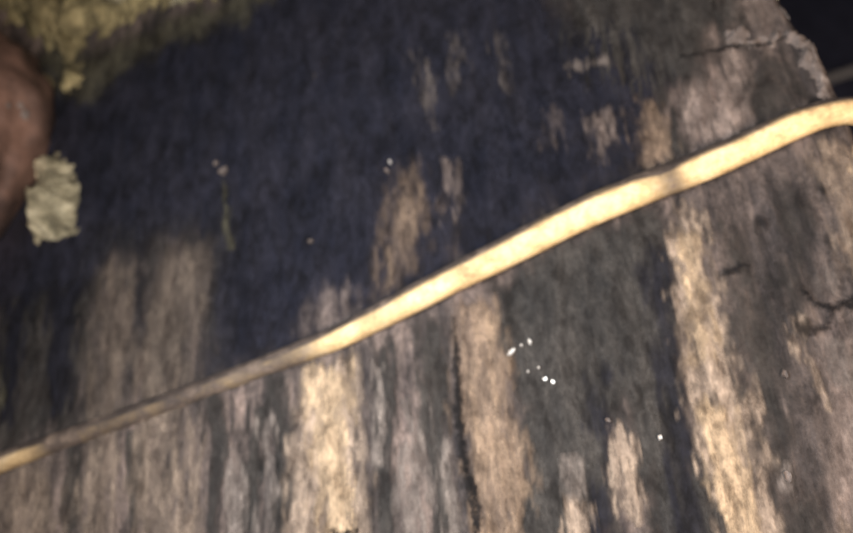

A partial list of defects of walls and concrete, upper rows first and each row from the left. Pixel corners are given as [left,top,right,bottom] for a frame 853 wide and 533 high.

crack [681,32,798,57]
crack [724,263,749,275]
crack [805,291,853,335]